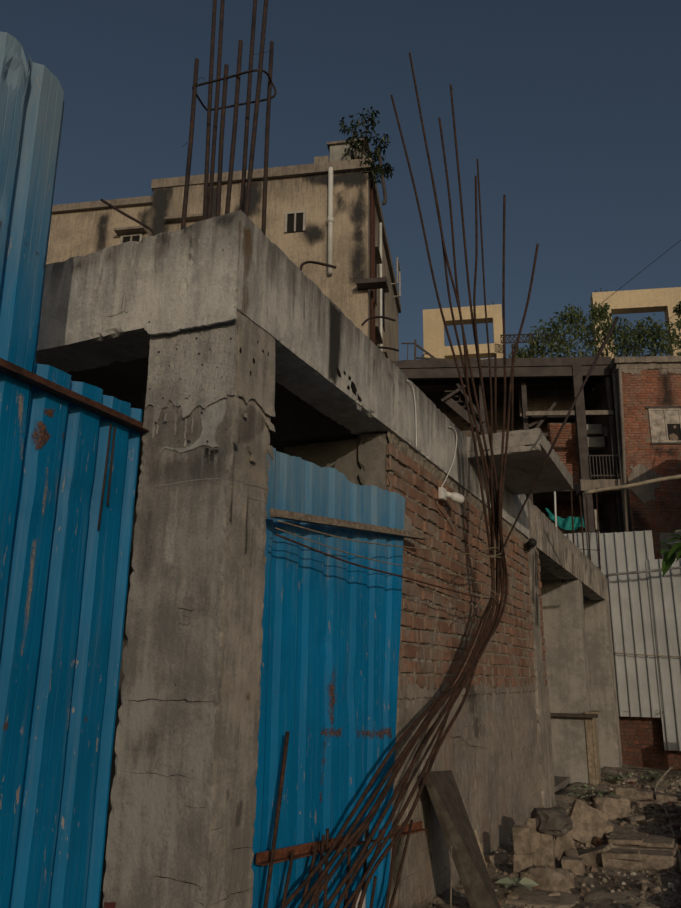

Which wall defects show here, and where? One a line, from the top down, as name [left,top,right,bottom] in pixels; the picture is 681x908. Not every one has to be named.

damp [97,215,108,251]
damp [141,187,172,236]
damp [304,171,366,283]
flaking render [145,307,275,440]
rust [33,409,54,449]
flaking render [280,52,539,908]
crack [124,697,209,705]
rust [321,680,341,746]
spalling [263,731,290,908]
crack [157,876,250,905]